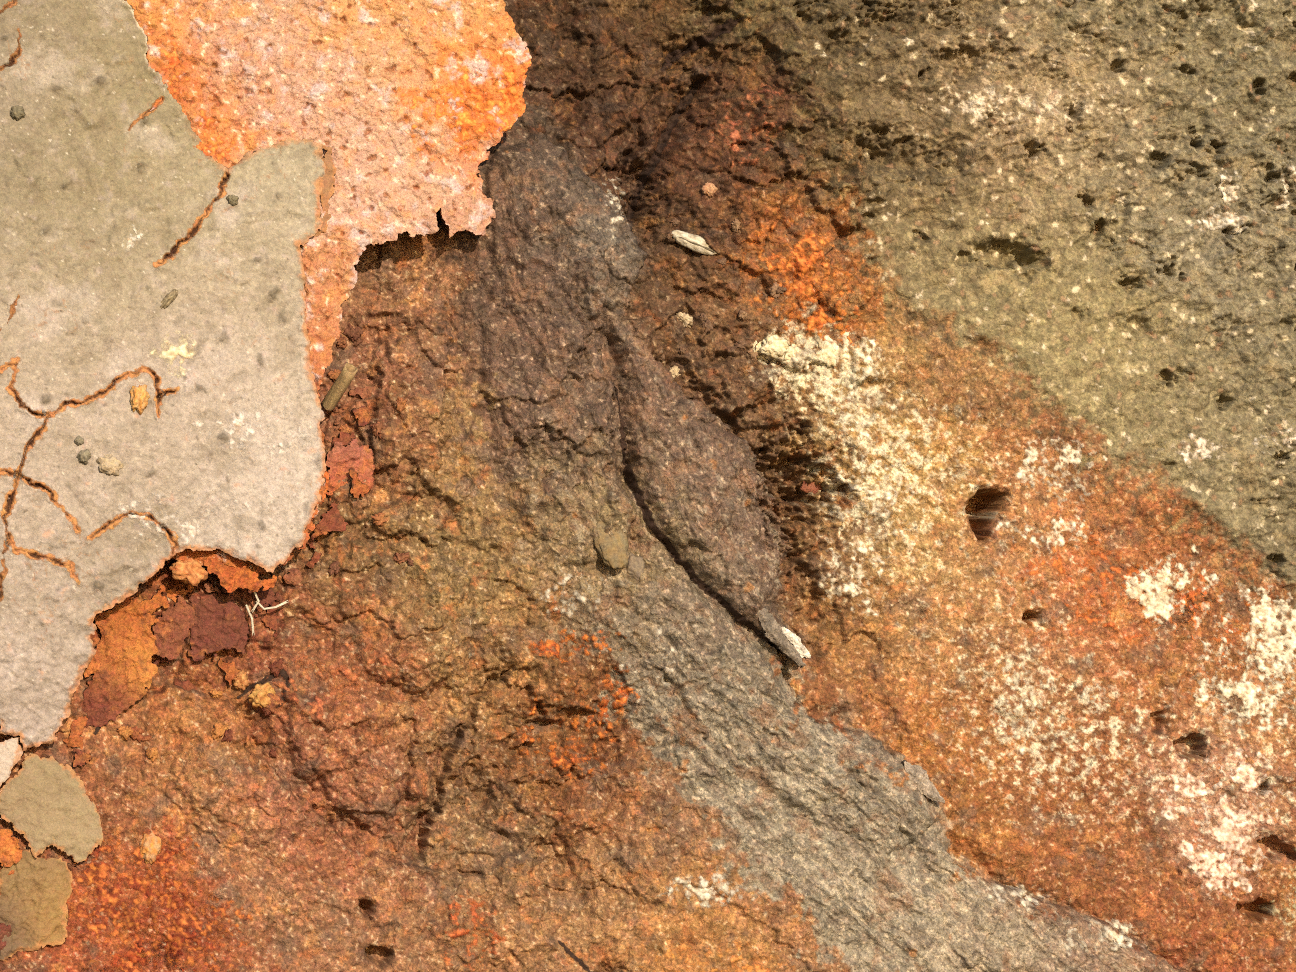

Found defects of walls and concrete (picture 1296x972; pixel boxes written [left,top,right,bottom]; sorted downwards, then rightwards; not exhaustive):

crack [0,0,22,71]
crack [128,96,164,131]
crack [153,171,230,267]
crack [0,295,180,602]
peeling [0,0,637,961]
damp [758,330,928,615]
damp [996,439,1107,546]
damp [1178,433,1220,463]
damp [1124,554,1296,731]
damp [998,663,1053,754]
damp [1151,748,1290,897]
damp [1046,920,1135,956]